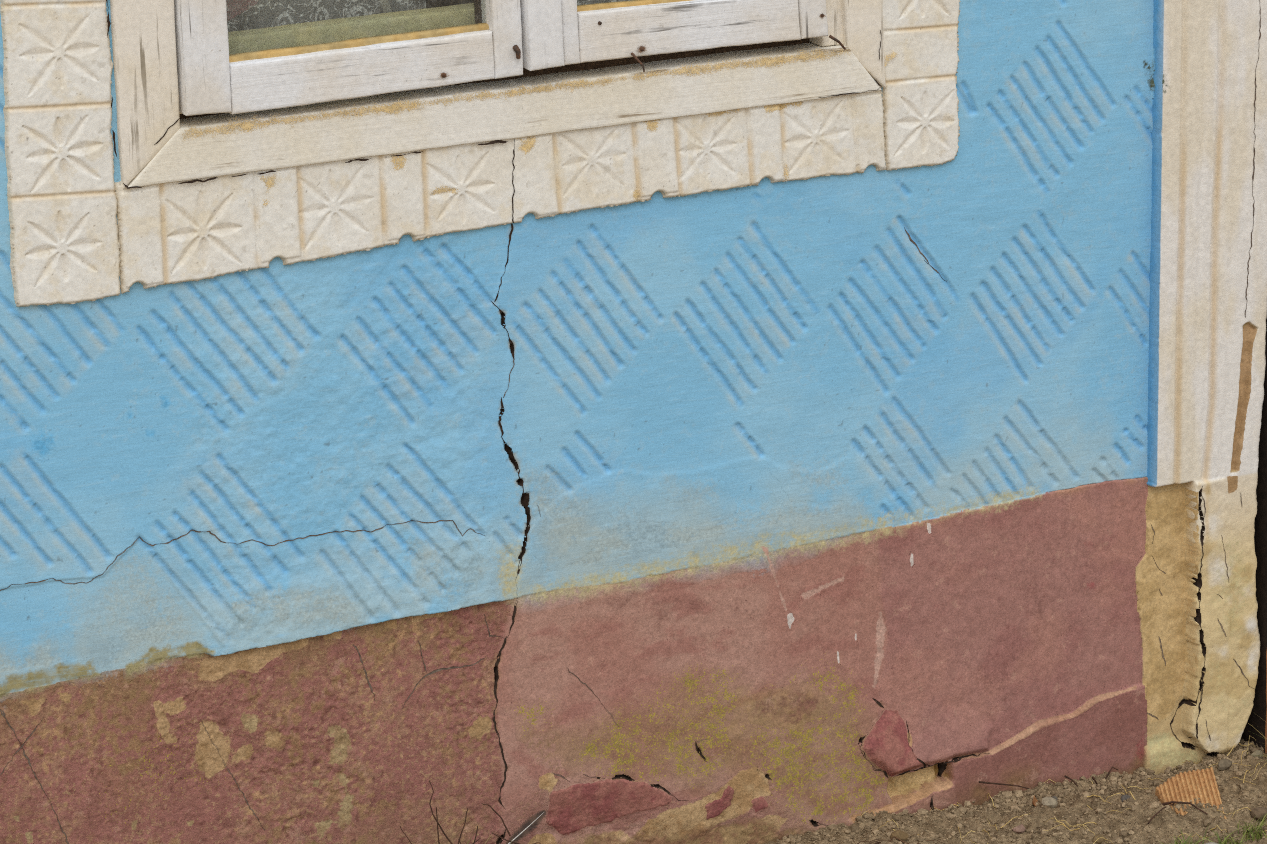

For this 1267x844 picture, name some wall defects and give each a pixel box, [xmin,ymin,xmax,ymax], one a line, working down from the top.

crack [178,170,276,184]
crack [345,140,541,844]
crack [0,520,480,591]
peeling [870,605,890,692]
spalling [953,486,1203,761]
crack [1147,486,1249,757]
peeling [151,694,286,781]
peeling [307,720,359,841]
peeling [524,765,825,844]
spalling [849,765,955,823]